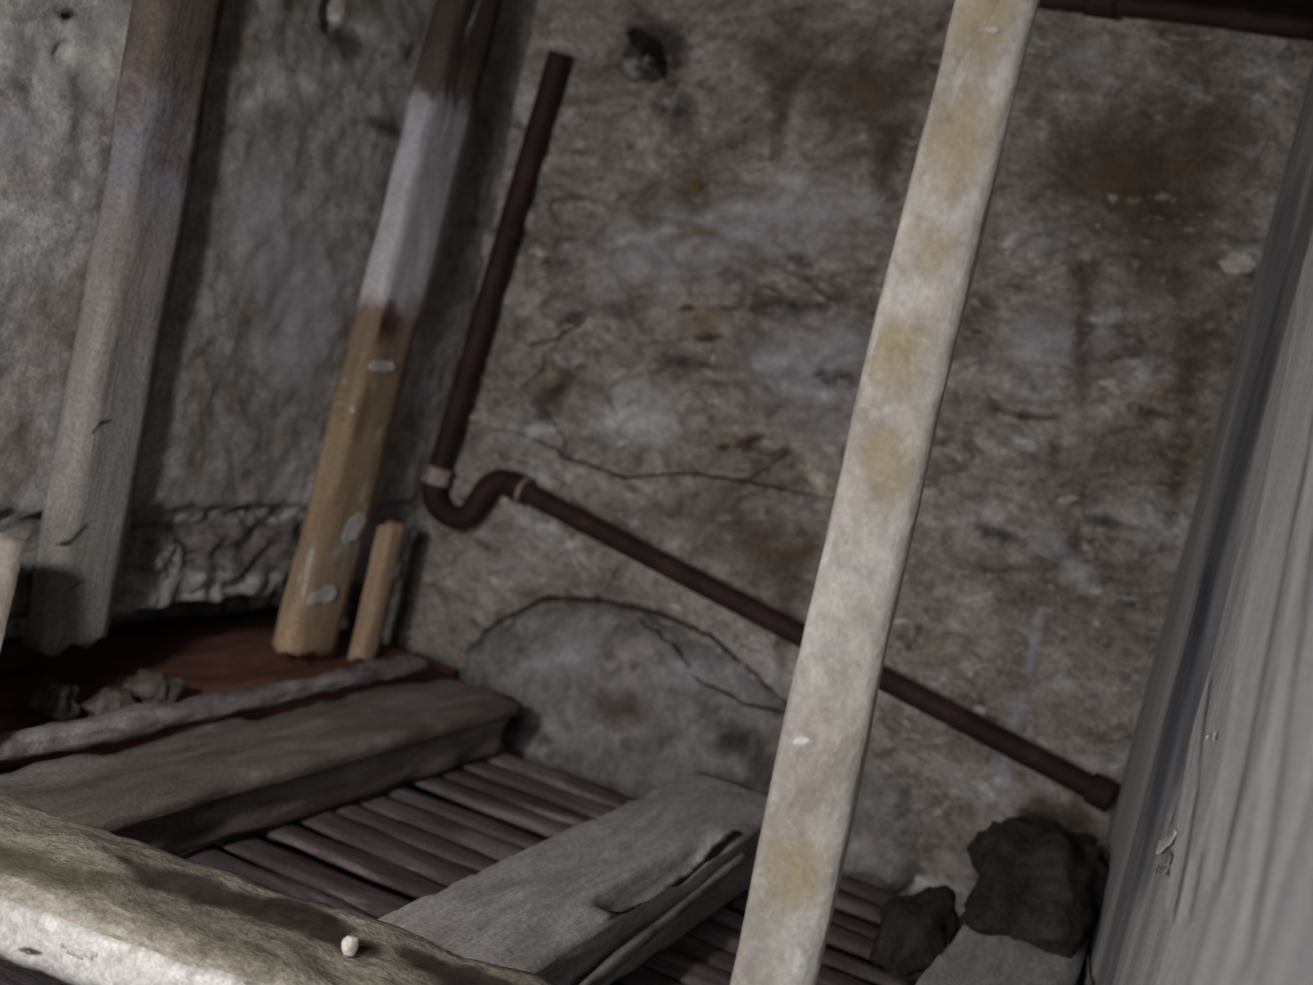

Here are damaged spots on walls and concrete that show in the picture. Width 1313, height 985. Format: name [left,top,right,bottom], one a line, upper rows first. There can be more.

spalling [622,25,683,80]
water stain [1065,120,1222,289]
crack [489,315,834,500]
spalling [121,505,299,585]
water stain [792,735,809,746]
water stain [789,948,806,980]